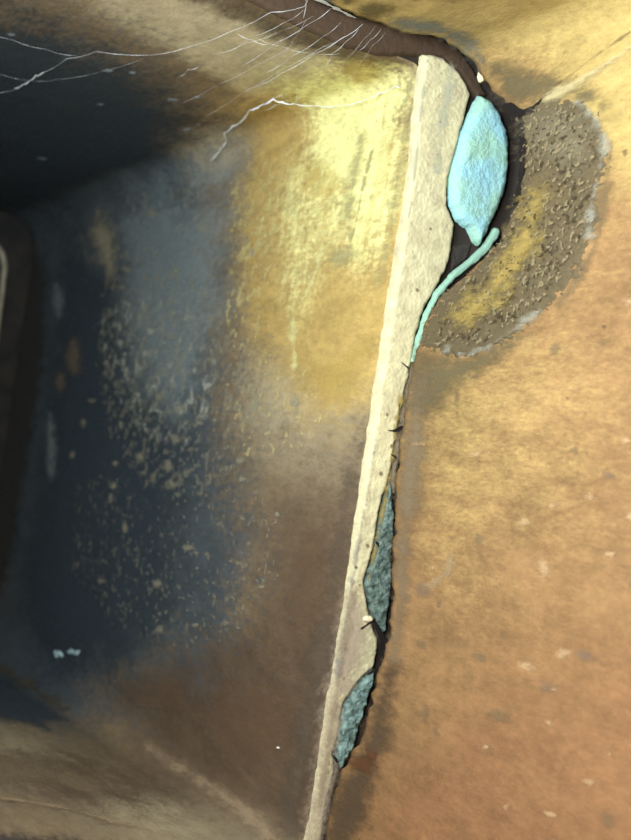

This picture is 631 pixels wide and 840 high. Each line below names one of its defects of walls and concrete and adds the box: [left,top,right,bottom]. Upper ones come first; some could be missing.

spalling [421,98,615,358]